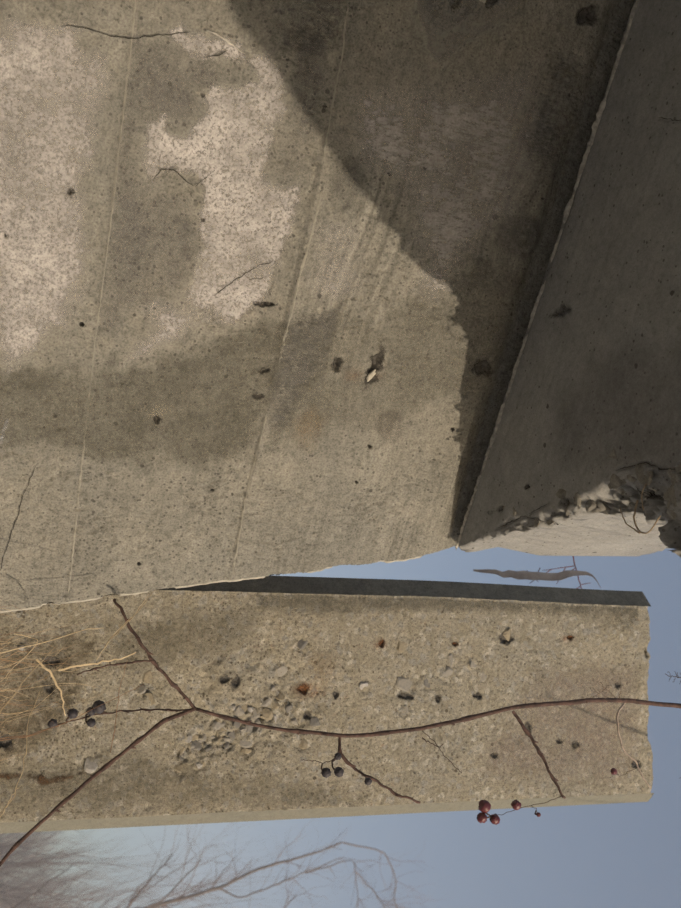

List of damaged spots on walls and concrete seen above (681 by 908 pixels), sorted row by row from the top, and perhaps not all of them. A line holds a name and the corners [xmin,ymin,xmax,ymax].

crack [61,25,191,39]
leakage [550,0,639,264]
leakage [0,28,99,358]
crack [152,168,215,199]
leakage [365,101,510,264]
crack [216,261,272,294]
leakage [87,326,289,462]
leakage [455,280,546,549]
spalling [556,489,611,516]
spalling [499,628,514,645]
flaking render [468,661,487,700]